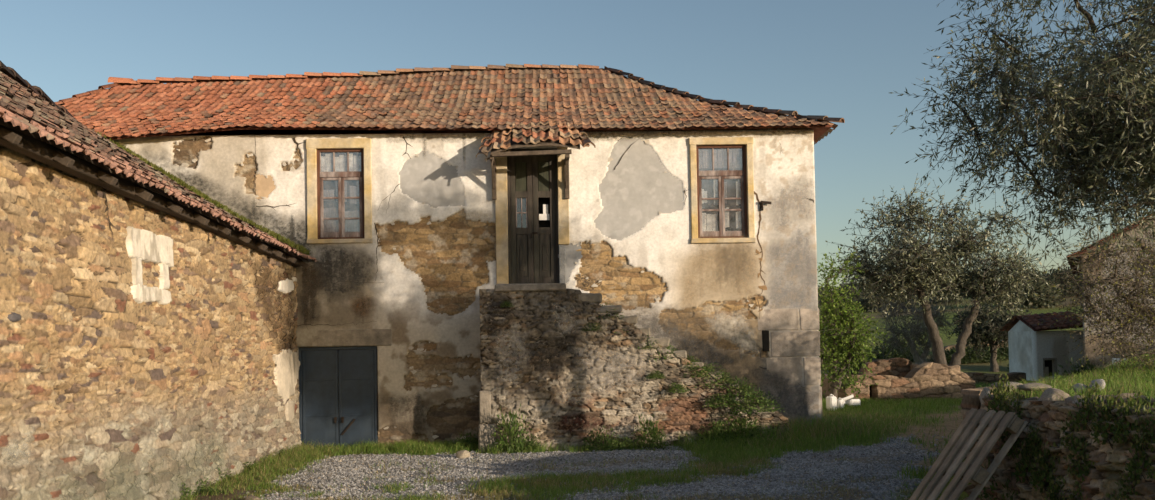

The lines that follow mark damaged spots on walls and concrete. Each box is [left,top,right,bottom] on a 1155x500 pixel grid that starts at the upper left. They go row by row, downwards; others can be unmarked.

flaking render [173,136,213,169]
flaking render [235,148,303,200]
damp [173,170,373,351]
flaking render [375,151,496,316]
peeling [558,136,768,358]
crack [754,191,767,319]
flaking render [378,341,481,446]